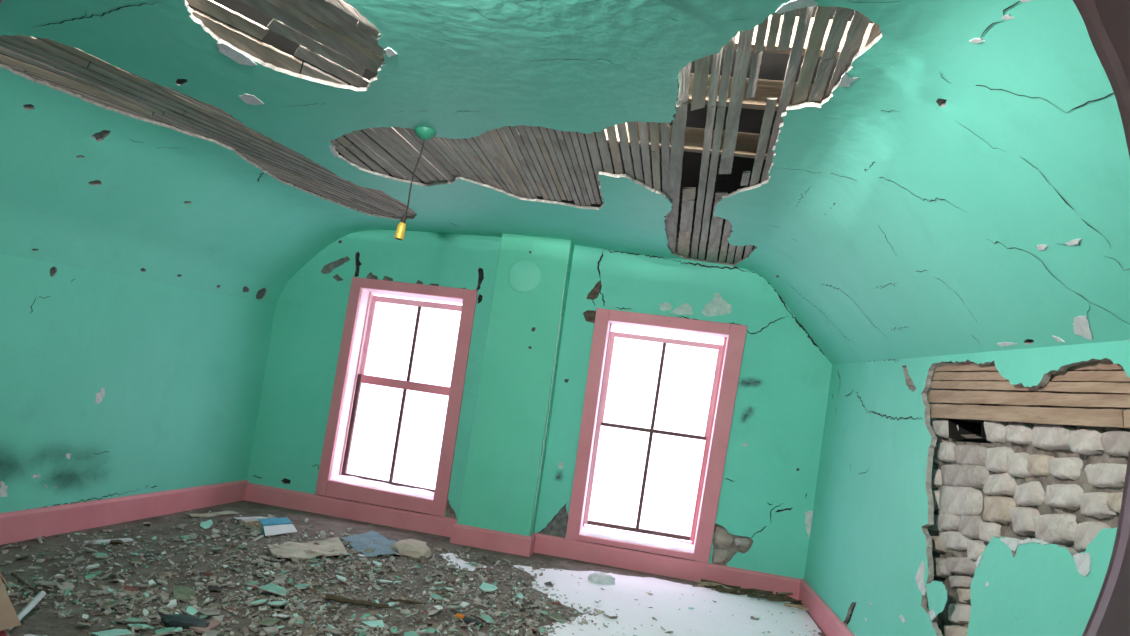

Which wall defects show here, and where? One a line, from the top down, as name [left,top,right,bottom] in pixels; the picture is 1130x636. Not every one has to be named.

crack [35,2,157,27]
crack [969,0,1032,43]
flaking render [217,42,257,66]
crack [940,74,1114,113]
crack [772,162,966,212]
crack [955,120,1129,324]
spalling [322,252,393,281]
spalling [531,249,569,538]
hole [948,419,987,441]
spalling [712,523,753,565]
flaking render [1000,537,1049,552]
flaking render [1073,553,1091,577]